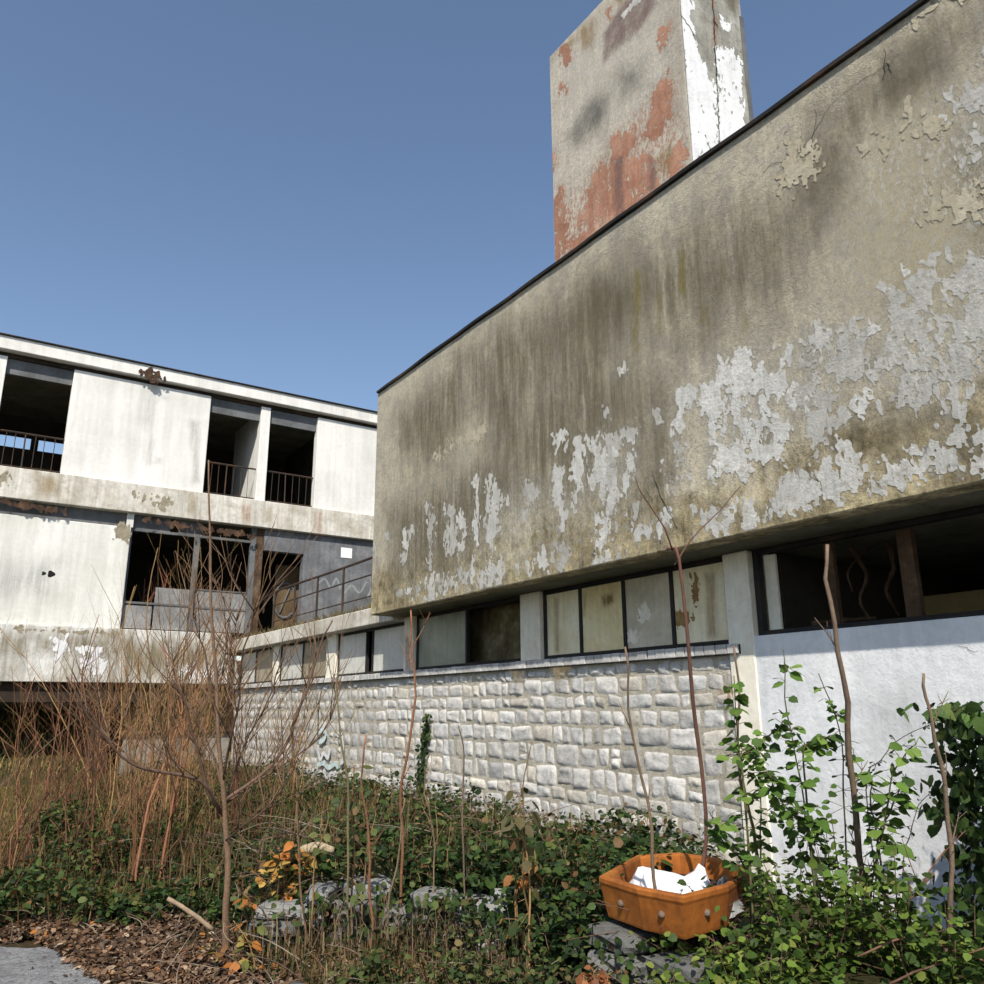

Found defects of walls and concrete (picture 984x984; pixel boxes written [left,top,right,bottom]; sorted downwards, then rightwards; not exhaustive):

flaking render [905,0,940,31]
flaking render [554,0,745,262]
flaking render [774,130,826,200]
crack [760,49,891,177]
peeling [856,80,984,173]
flaking render [916,177,984,227]
leakage [646,228,782,317]
peeling [372,246,984,602]
peeling [13,624,118,676]